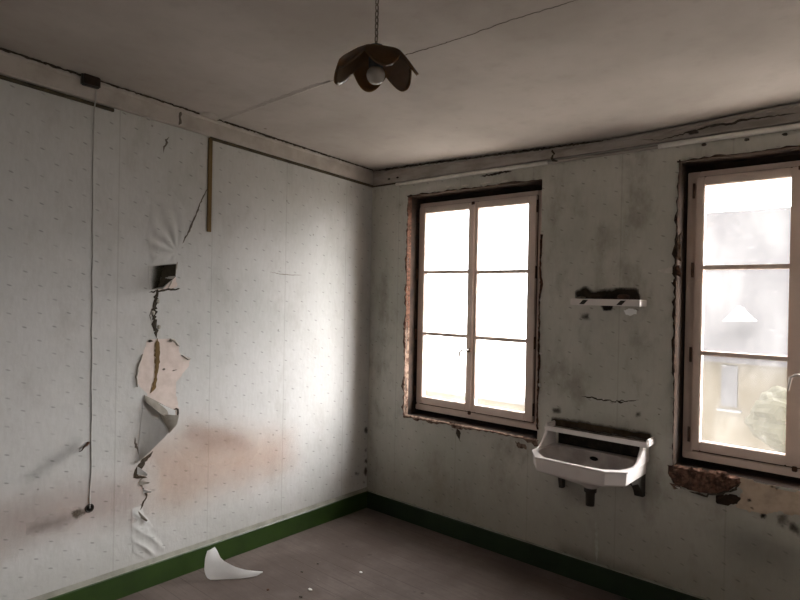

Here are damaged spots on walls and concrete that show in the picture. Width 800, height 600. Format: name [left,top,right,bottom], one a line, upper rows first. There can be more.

crack [0,47,81,76]
crack [101,80,616,177]
crack [640,113,795,140]
crack [183,190,207,243]
crack [149,288,180,338]
spalling [401,197,543,450]
spalling [575,286,640,316]
spalling [668,145,800,518]
peeling [135,338,191,462]
crack [582,396,636,404]